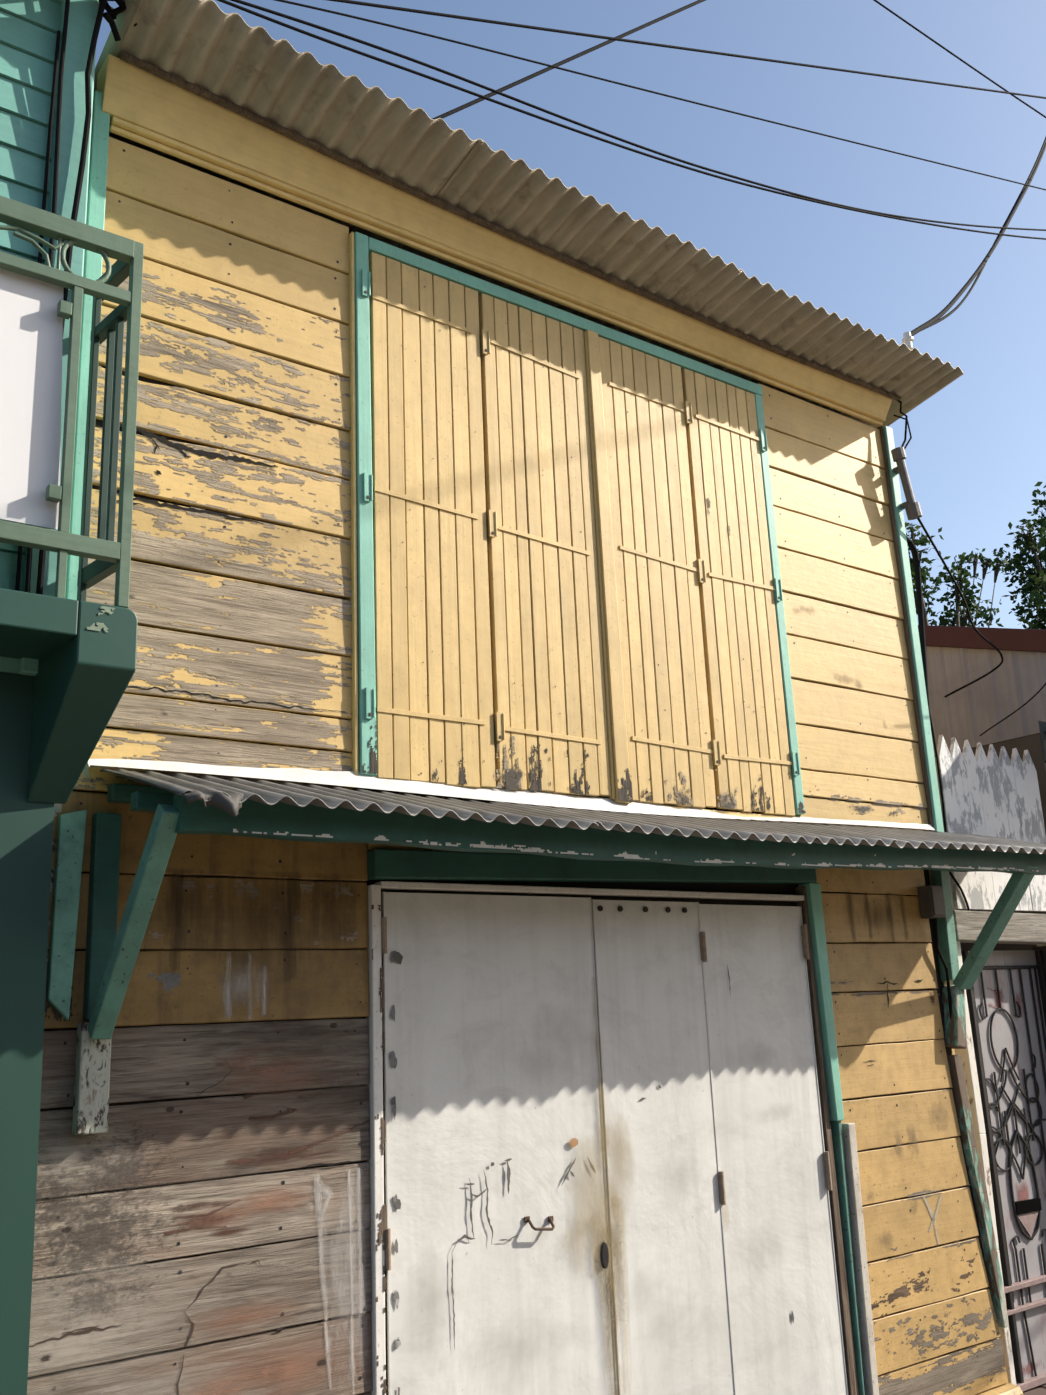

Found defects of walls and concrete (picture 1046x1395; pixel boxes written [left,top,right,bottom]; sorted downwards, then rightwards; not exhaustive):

crack [96,424,278,523]
peeling [75,273,366,790]
peeling [496,742,523,790]
peeling [233,813,333,838]
peeling [406,840,593,855]
peeling [614,851,671,861]
peeling [775,853,1039,872]
crack [29,1325,121,1347]
crack [176,1260,262,1395]
peeling [871,1238,1007,1395]